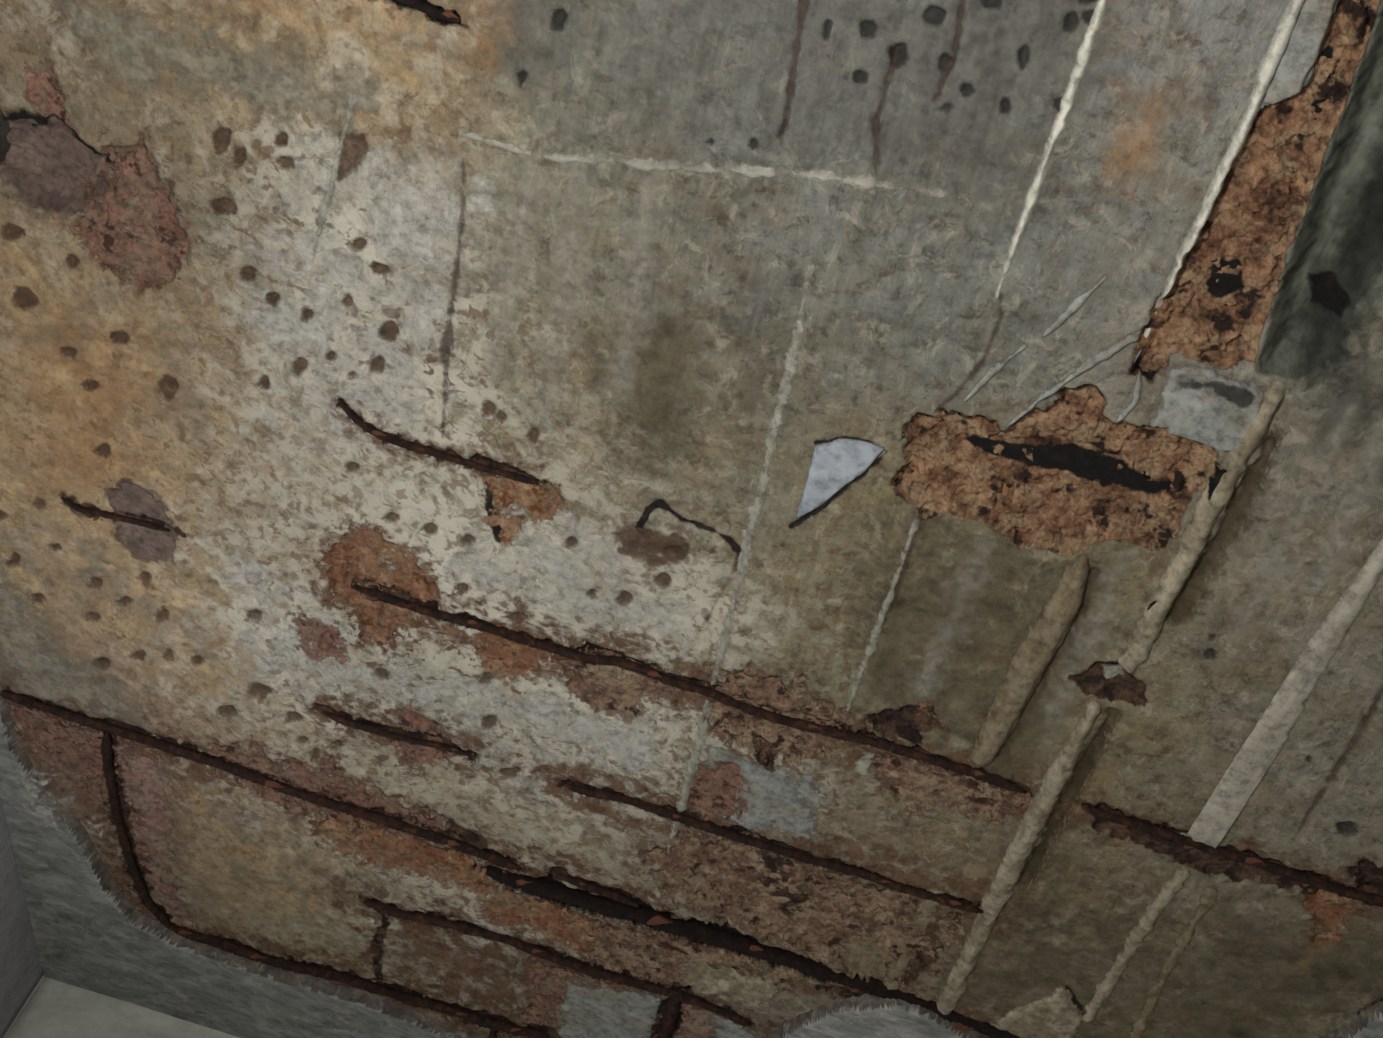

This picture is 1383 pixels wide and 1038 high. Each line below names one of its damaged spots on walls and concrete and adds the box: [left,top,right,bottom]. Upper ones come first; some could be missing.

crack [784,0,808,123]
crack [872,46,900,167]
spalling [889,0,1380,558]
rust [0,238,256,696]
spalling [289,512,443,679]
rust [308,554,1045,821]
crack [635,499,741,569]
flaking render [796,439,884,518]
flaking render [0,670,480,1038]
rust [0,676,1031,1038]
spalling [185,611,1082,1038]
rust [1050,789,1383,918]